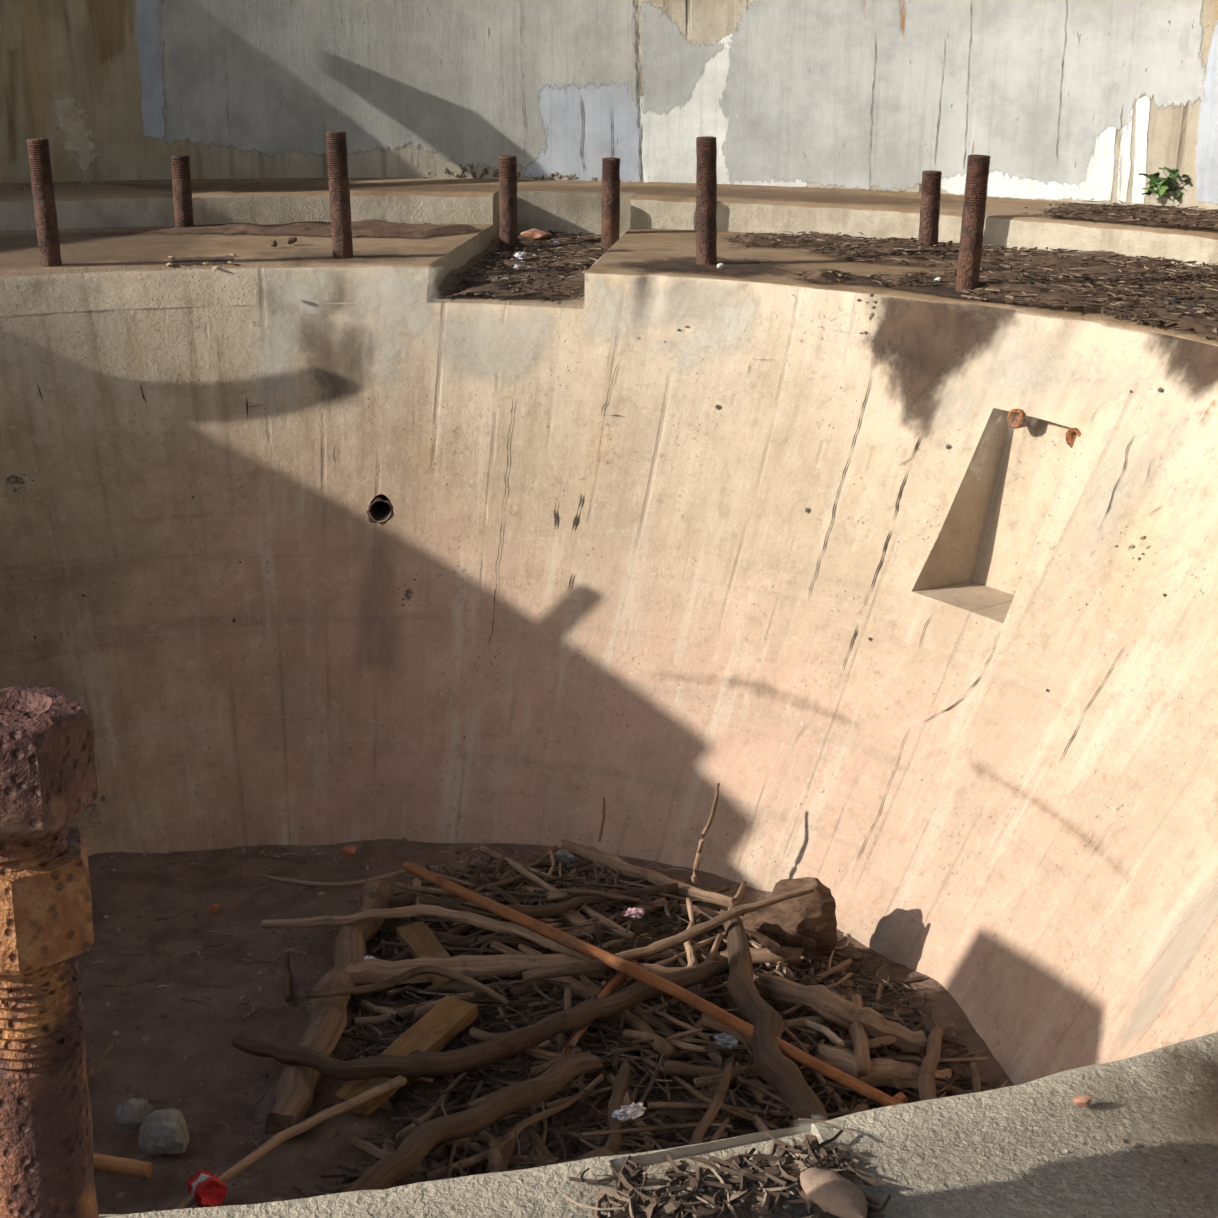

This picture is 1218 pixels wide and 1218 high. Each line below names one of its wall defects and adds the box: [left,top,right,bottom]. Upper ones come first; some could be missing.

peeling [135,0,1218,204]
leakage [264,251,426,401]
leakage [841,276,1018,427]
leakage [1158,323,1218,394]
crack [808,379,871,598]
crack [842,422,927,668]